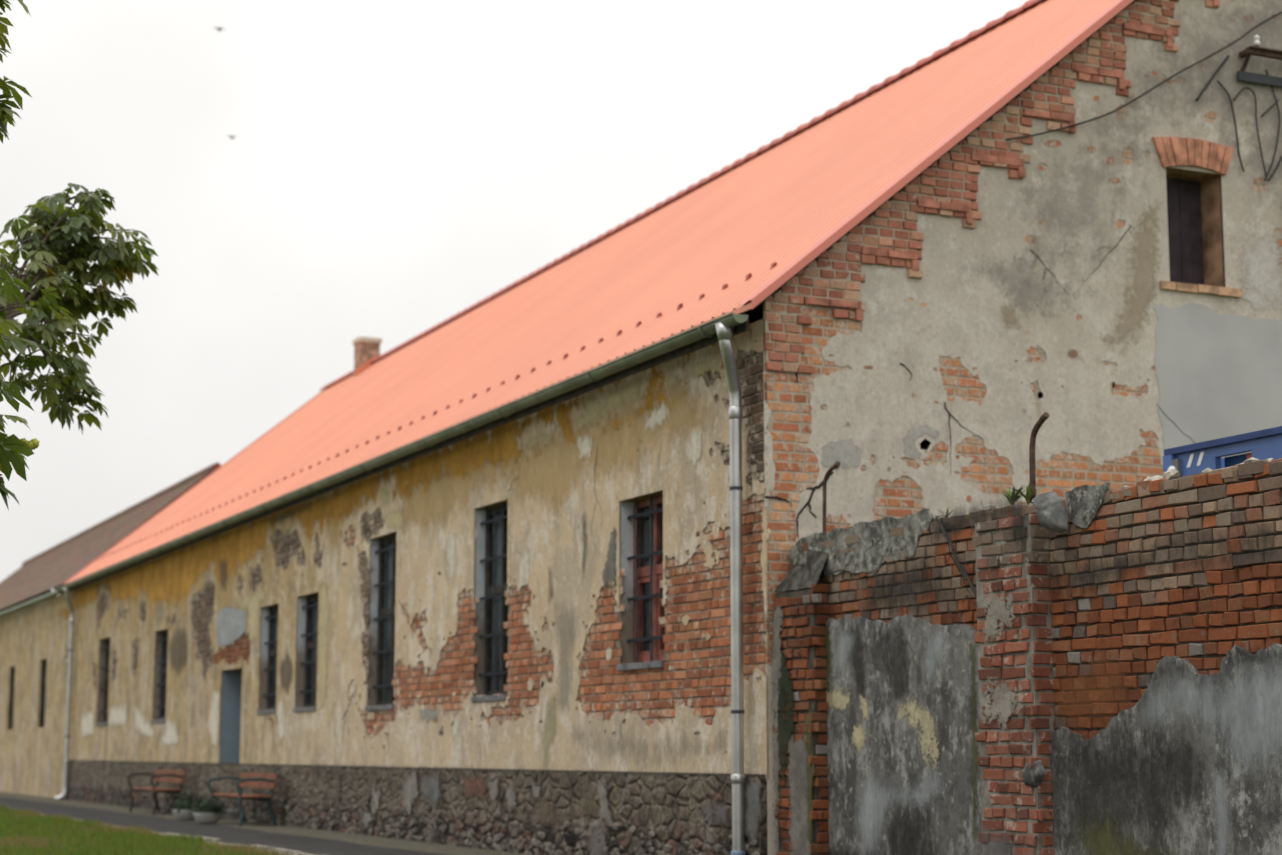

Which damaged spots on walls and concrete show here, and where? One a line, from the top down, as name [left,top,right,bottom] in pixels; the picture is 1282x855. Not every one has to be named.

flaking render [934,357,987,422]
flaking render [1101,361,1148,397]
flaking render [861,429,1163,520]
flaking render [238,529,323,594]
flaking render [576,308,874,737]
flaking render [166,581,251,747]
flaking render [341,507,555,750]
leakage [835,629,865,697]
leakage [882,629,945,701]
leakage [1147,651,1282,772]
leakage [858,772,941,855]
leakage [1058,731,1228,855]